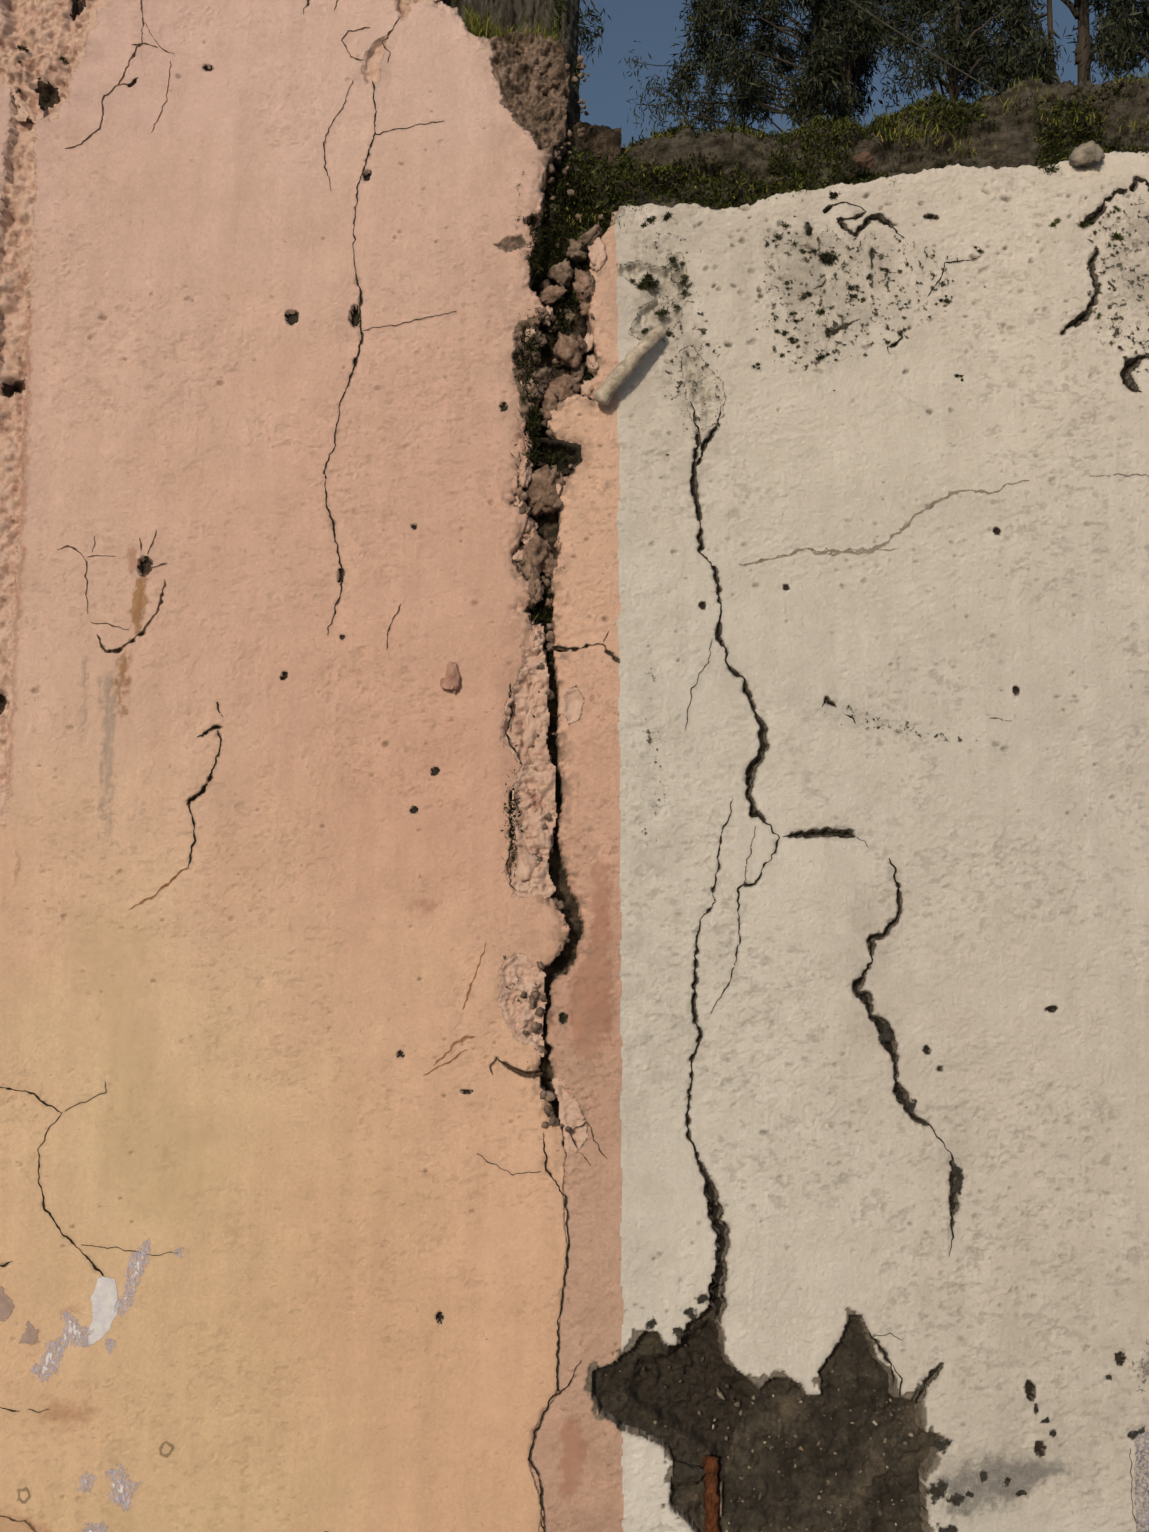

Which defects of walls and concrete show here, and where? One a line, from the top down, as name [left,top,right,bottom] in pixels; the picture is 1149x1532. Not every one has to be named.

spalling [0,0,109,827]
crack [303,0,456,635]
spalling [499,315,541,422]
crack [57,530,166,653]
crack [128,702,223,910]
crack [478,48,622,1532]
crack [685,401,1029,1317]
crack [0,1081,174,1276]
peeling [0,1240,151,1381]
peeling [77,1466,139,1512]
spalling [592,1278,936,1532]
crack [869,1332,944,1404]